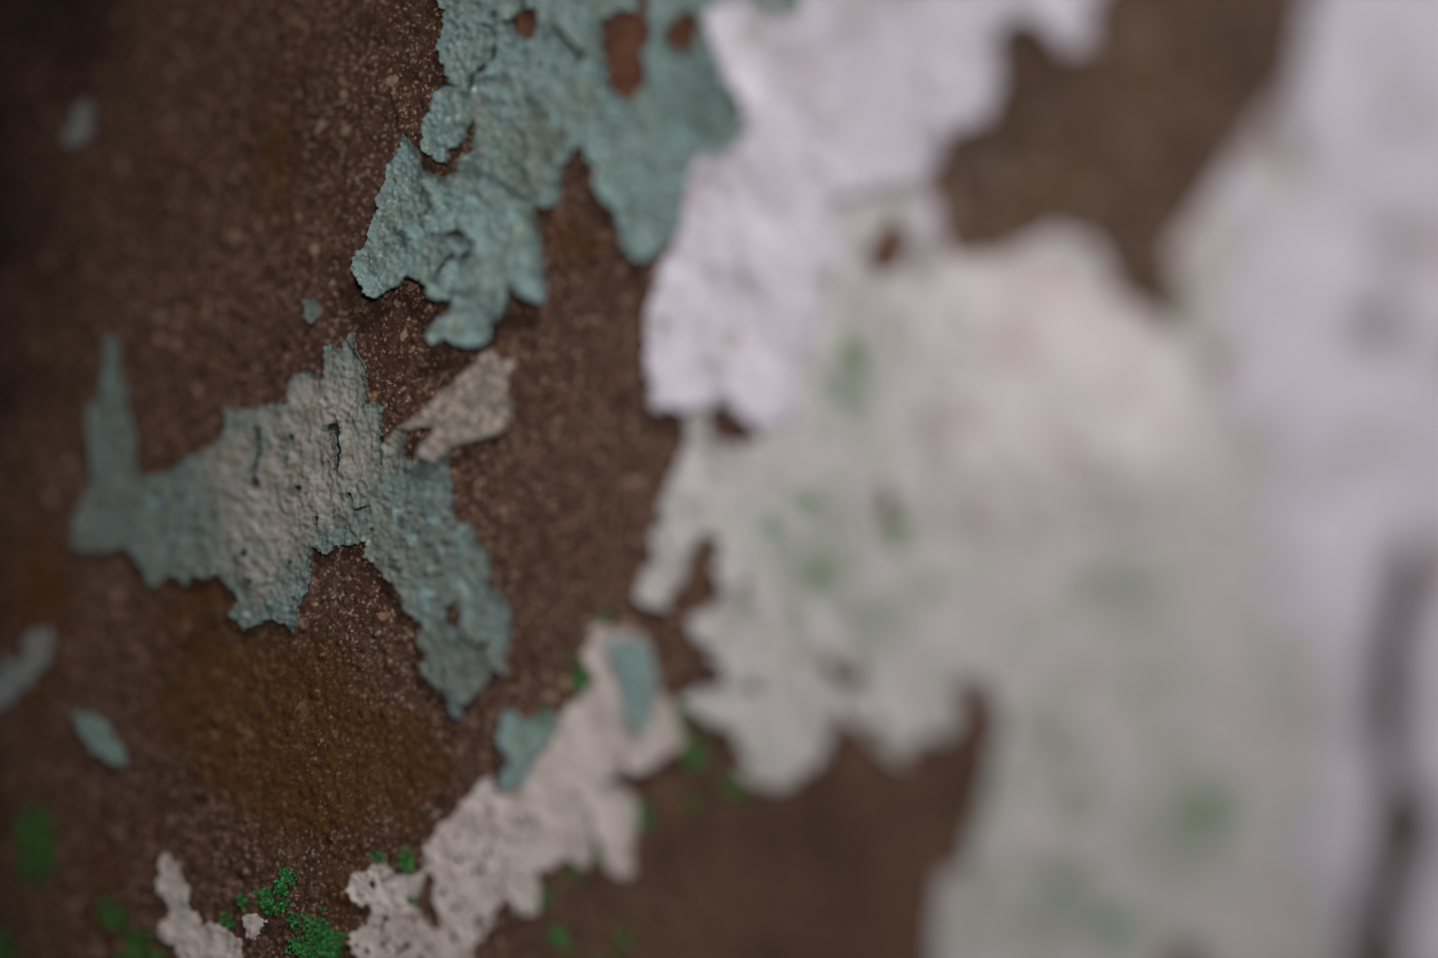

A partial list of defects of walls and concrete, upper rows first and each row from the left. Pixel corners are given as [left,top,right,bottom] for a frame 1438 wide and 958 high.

peeling [70,332,517,720]
peeling [345,0,1438,958]
peeling [72,711,127,767]
peeling [156,853,268,958]